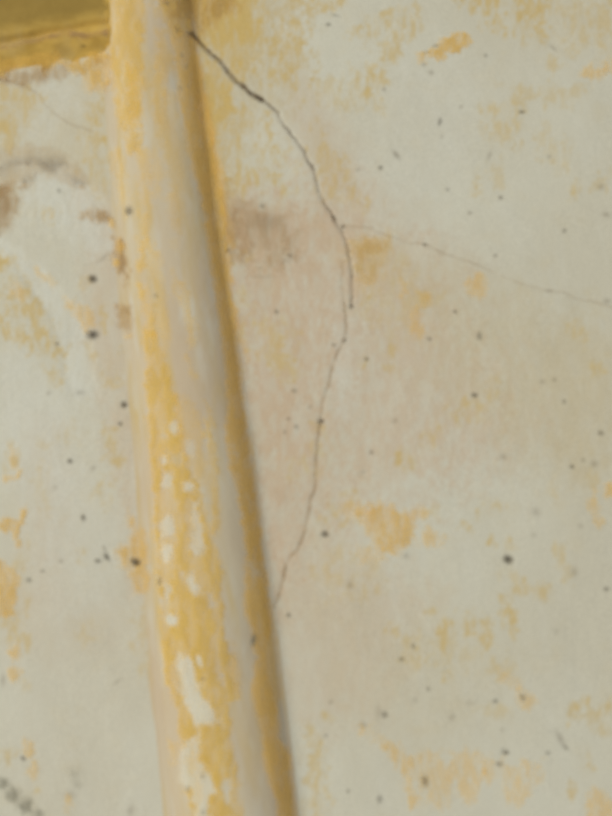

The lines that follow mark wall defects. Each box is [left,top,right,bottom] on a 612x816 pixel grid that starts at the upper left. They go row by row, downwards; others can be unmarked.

crack [191,34,262,100]
peeling [145,362,203,522]
peeling [158,525,236,816]